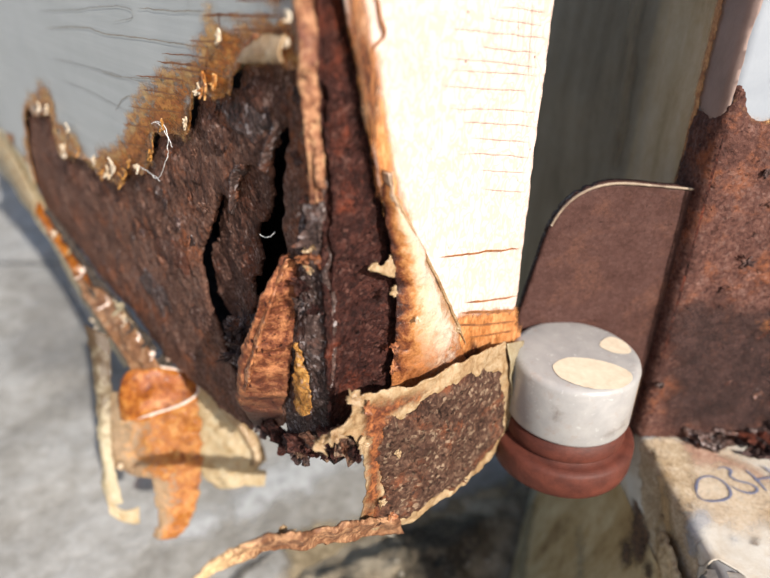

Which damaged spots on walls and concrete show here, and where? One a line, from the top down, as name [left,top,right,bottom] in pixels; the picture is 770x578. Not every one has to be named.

crack [42,0,284,160]
peeling [192,70,217,100]
peeling [234,33,290,71]
peeling [59,123,80,158]
corrosion [23,0,411,467]
spalling [256,127,290,297]
corrosion [632,0,770,529]
peeling [214,303,245,374]
peeling [193,340,524,578]
crack [231,551,274,578]
corrosion [621,499,651,577]
peeling [704,569,747,578]